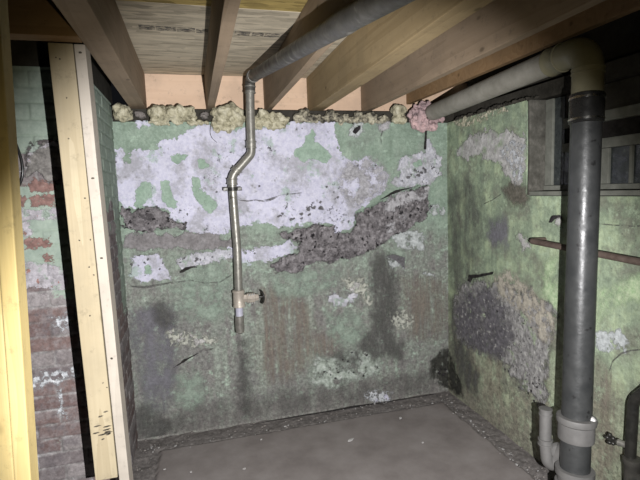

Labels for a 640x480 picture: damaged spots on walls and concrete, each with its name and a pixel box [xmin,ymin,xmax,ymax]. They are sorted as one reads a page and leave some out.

peeling [24,138,53,166]
peeling [20,177,67,291]
peeling [115,124,247,282]
peeling [237,121,445,274]
peeling [457,127,528,187]
damp [311,256,414,389]
damp [430,300,479,397]
spalling [453,271,559,407]
peeling [595,329,628,353]